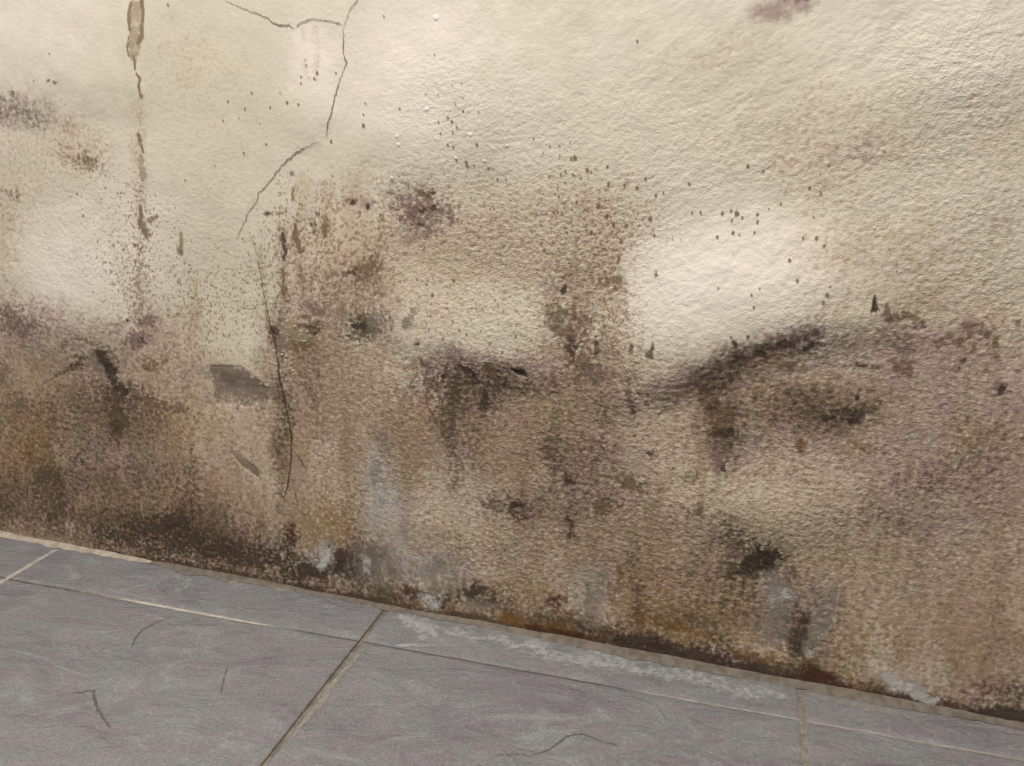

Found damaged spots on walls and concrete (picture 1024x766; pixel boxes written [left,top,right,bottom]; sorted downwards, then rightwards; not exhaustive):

water stain [389,189,459,242]
water stain [280,224,303,293]
crack [227,1,357,506]
water stain [269,302,325,354]
water stain [544,284,622,384]
water stain [883,302,925,328]
water stain [57,338,188,413]
water stain [689,326,820,475]
water stain [94,509,371,591]
water stain [724,539,779,577]
water stain [397,555,797,700]
water stain [875,672,940,706]